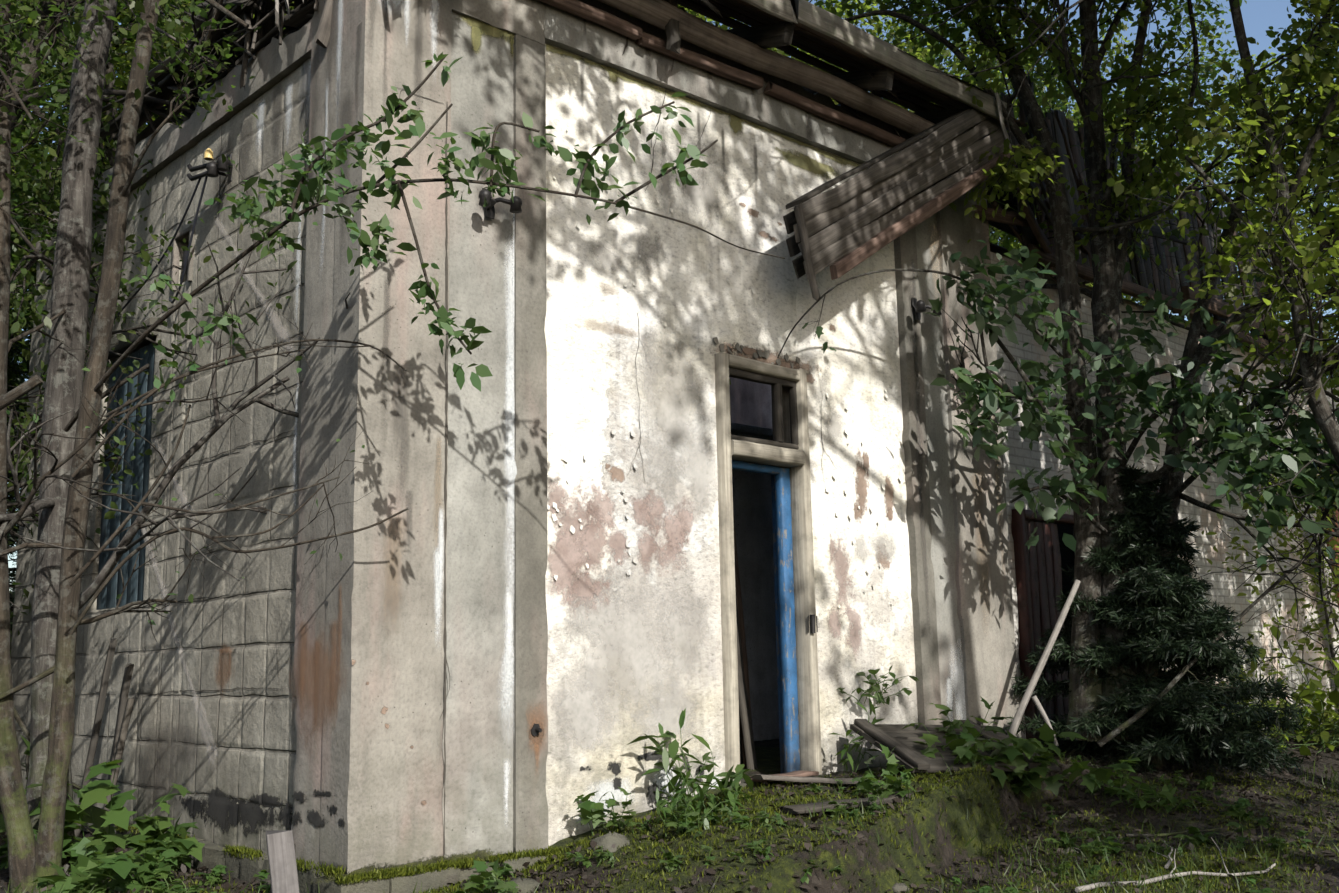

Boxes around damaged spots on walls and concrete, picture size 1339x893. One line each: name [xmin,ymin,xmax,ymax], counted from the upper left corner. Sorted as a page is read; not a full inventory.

water stain [506,251,517,523]
spalling [713,337,831,398]
peeling [547,320,717,747]
peeling [825,406,902,653]
water stain [504,594,512,700]
peeling [179,795,205,818]
peeling [249,791,345,830]